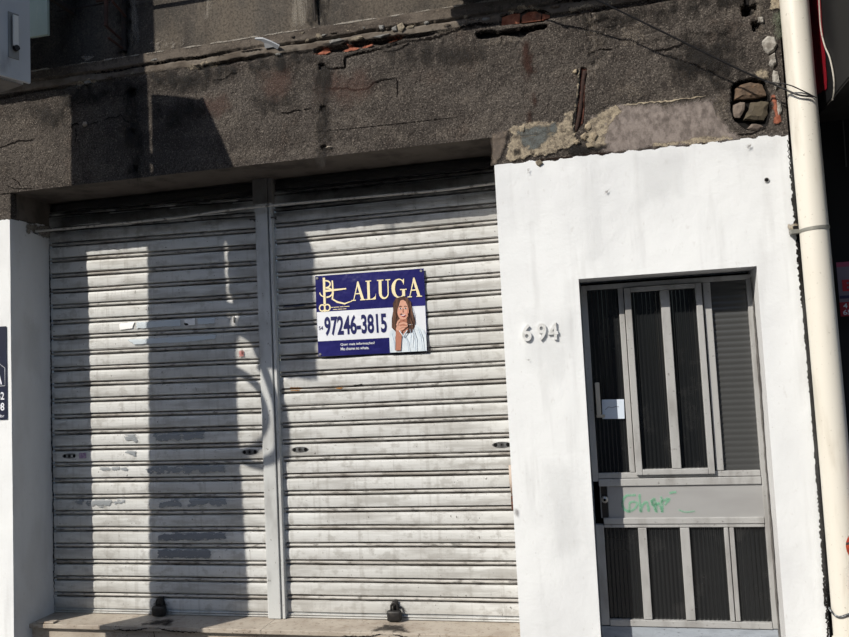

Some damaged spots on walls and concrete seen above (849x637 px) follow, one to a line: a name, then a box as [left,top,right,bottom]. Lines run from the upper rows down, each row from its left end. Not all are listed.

crack [325,22,498,97]
flaking render [291,0,614,84]
peeling [491,0,783,167]